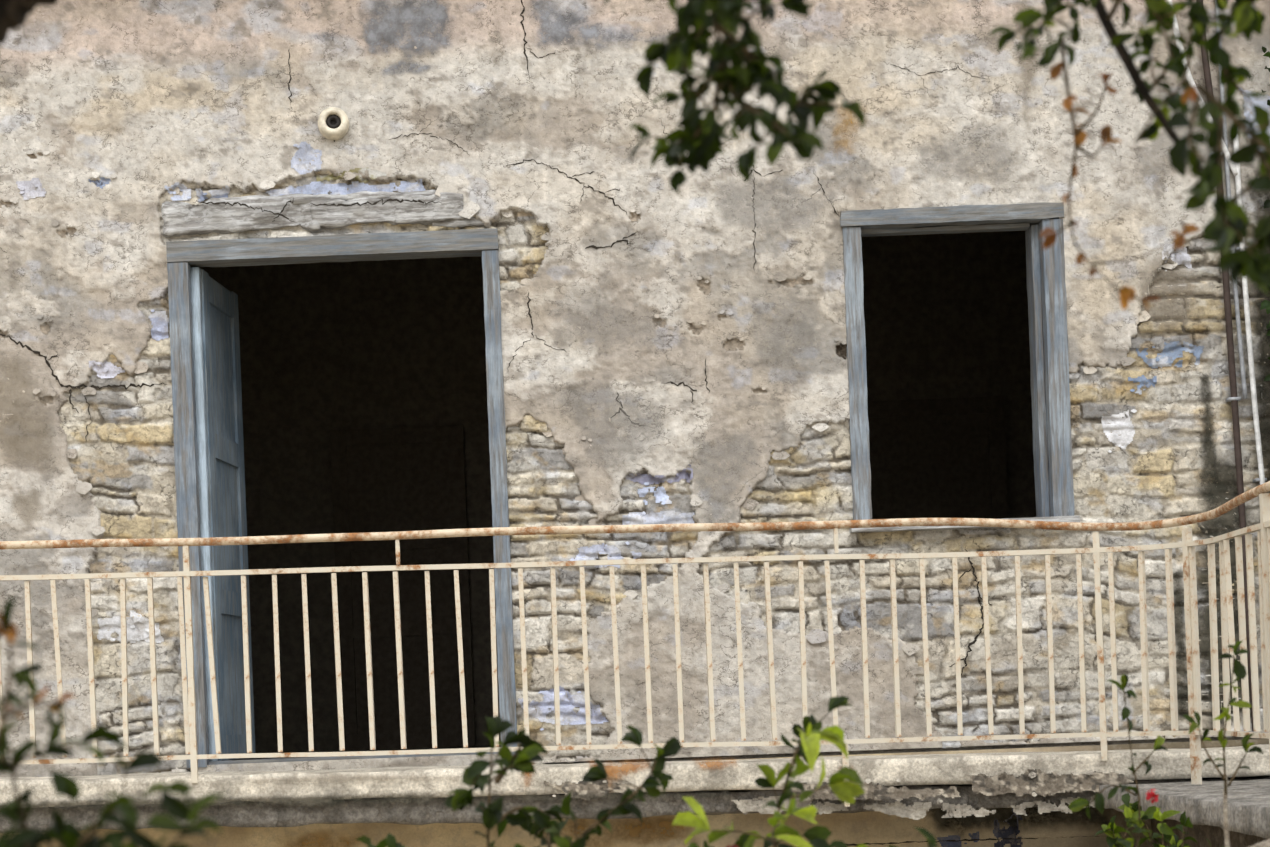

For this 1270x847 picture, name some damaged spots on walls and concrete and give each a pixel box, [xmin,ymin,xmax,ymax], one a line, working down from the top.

leakage [365,0,449,72]
crack [520,0,555,79]
leakage [532,1,633,43]
spalling [158,142,550,292]
crack [506,159,636,249]
crack [0,334,166,438]
spalling [33,291,190,775]
spalling [505,224,1270,764]
crack [949,547,991,676]
spalling [544,779,635,801]
spalling [731,769,1134,847]